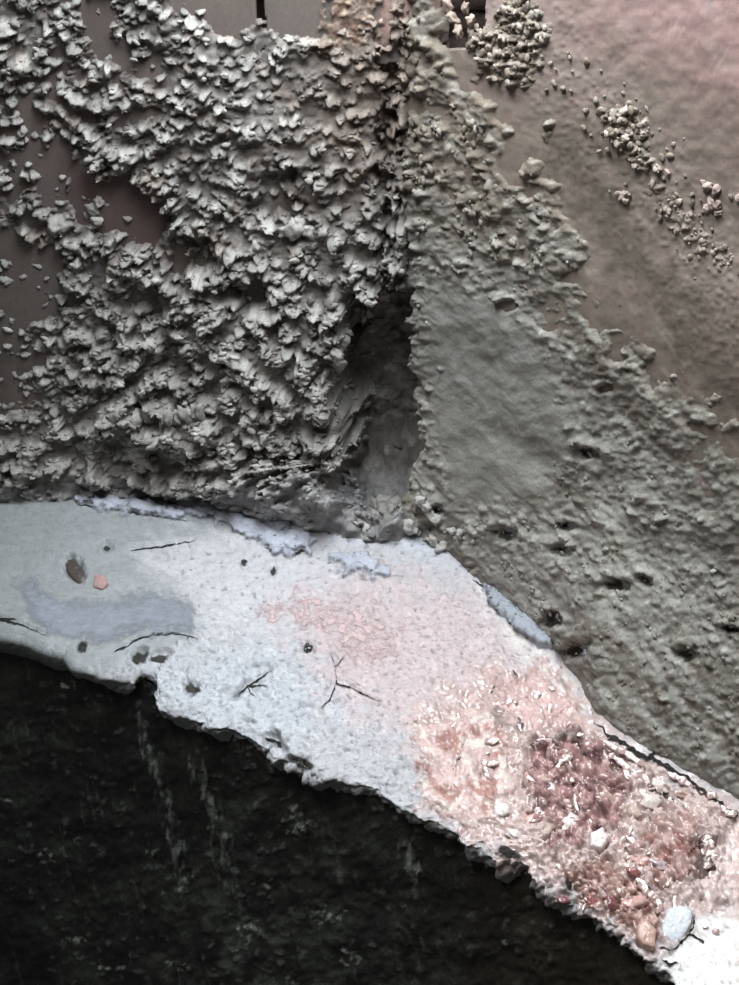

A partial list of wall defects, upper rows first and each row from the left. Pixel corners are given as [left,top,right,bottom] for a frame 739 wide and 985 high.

peeling [74,494,318,556]
crack [0,618,44,635]
crack [238,671,270,696]
crack [322,653,376,707]
damp [138,718,185,885]
damp [188,758,222,820]
corrosion [411,657,633,848]
crack [593,721,738,816]
corrosion [560,806,739,939]